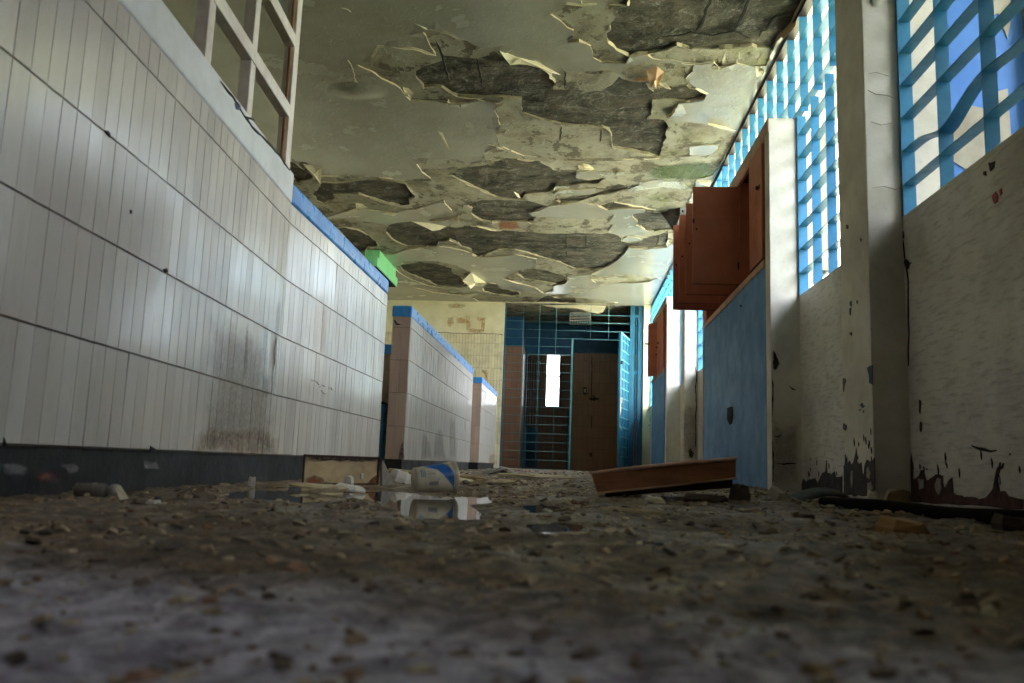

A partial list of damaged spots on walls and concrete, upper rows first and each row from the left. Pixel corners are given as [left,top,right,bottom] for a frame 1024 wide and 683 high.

crack [220,81,290,171]
peeling [290,0,801,314]
crack [903,239,912,366]
peeling [802,423,876,497]
peeling [910,450,1024,509]